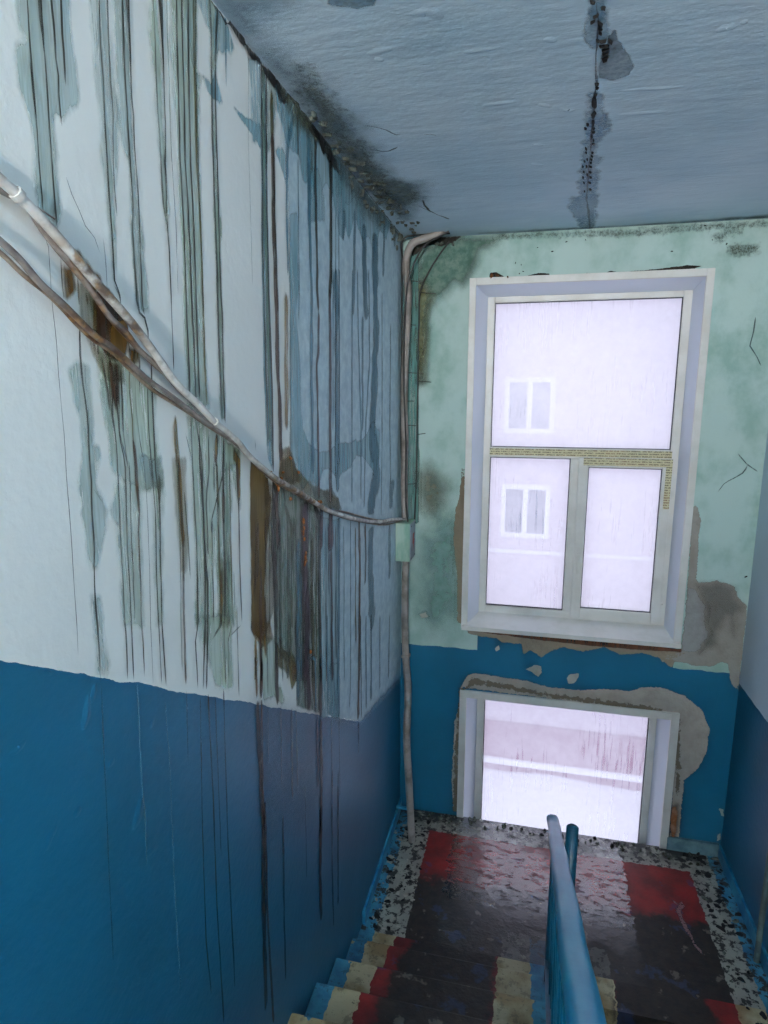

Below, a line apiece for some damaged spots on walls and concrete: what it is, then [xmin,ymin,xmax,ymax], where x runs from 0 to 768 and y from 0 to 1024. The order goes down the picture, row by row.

leakage [17,0,77,224]
leakage [99,0,149,338]
leakage [151,0,232,418]
leakage [238,63,396,514]
leakage [329,0,376,9]
crack [569,0,613,229]
leakage [74,330,104,677]
leakage [99,346,166,682]
rust [250,448,375,718]
flaking render [451,470,747,837]
crack [719,455,756,490]
leakage [256,700,274,1022]